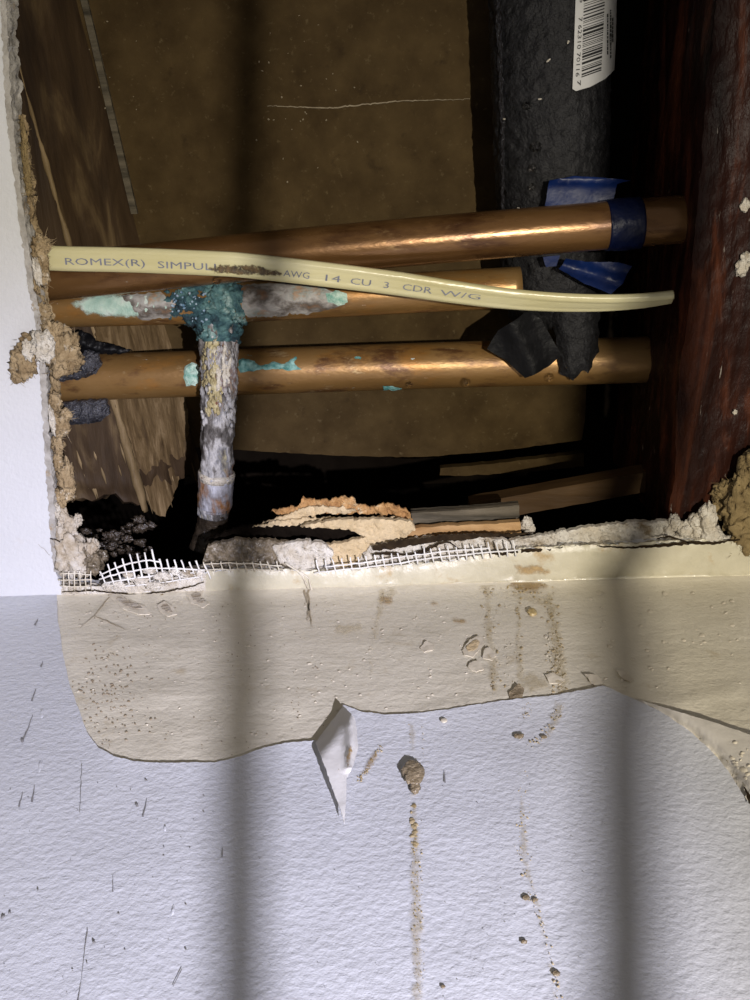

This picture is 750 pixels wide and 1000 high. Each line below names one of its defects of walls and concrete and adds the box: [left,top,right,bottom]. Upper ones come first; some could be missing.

spalling [0,0,55,331]
peeling [39,363,750,763]
damp [479,588,523,691]
damp [409,804,425,997]